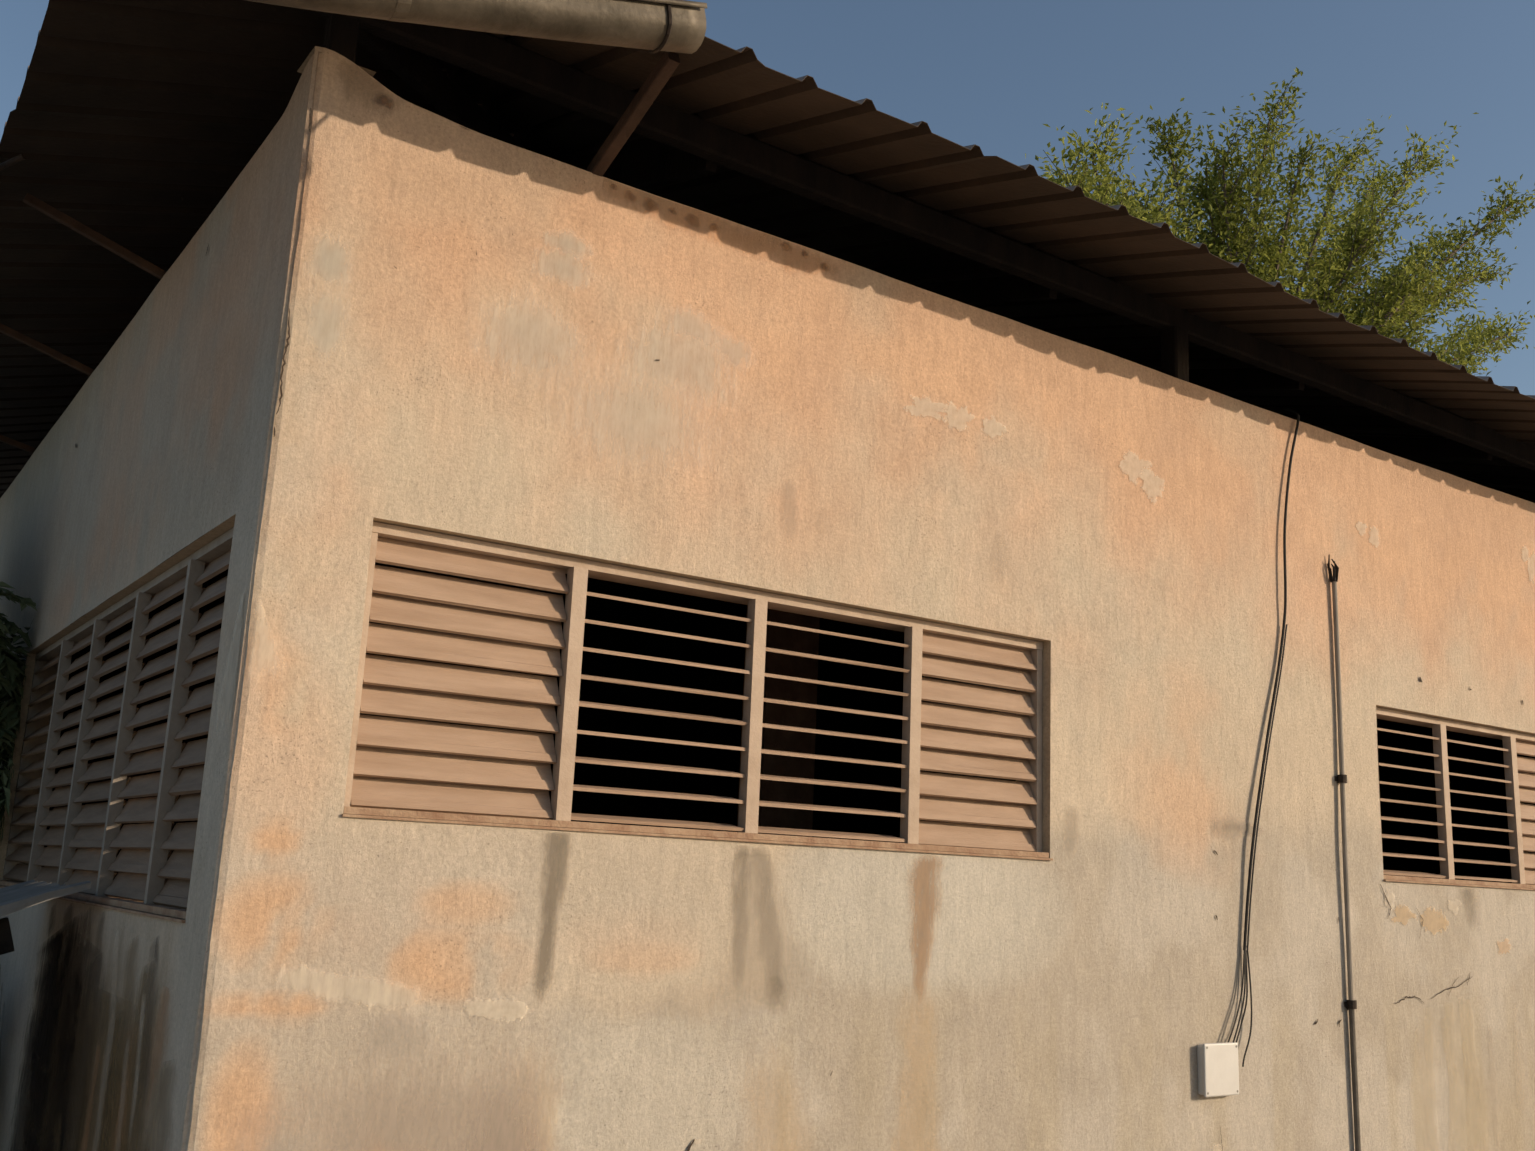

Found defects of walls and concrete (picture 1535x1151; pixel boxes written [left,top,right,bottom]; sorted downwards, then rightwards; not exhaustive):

crack [274,309,290,437]
peeling [903,396,1006,438]
peeling [1120,451,1165,503]
water stain [537,833,568,994]
water stain [734,850,783,999]
water stain [10,912,171,1151]
crack [1395,975,1472,1004]